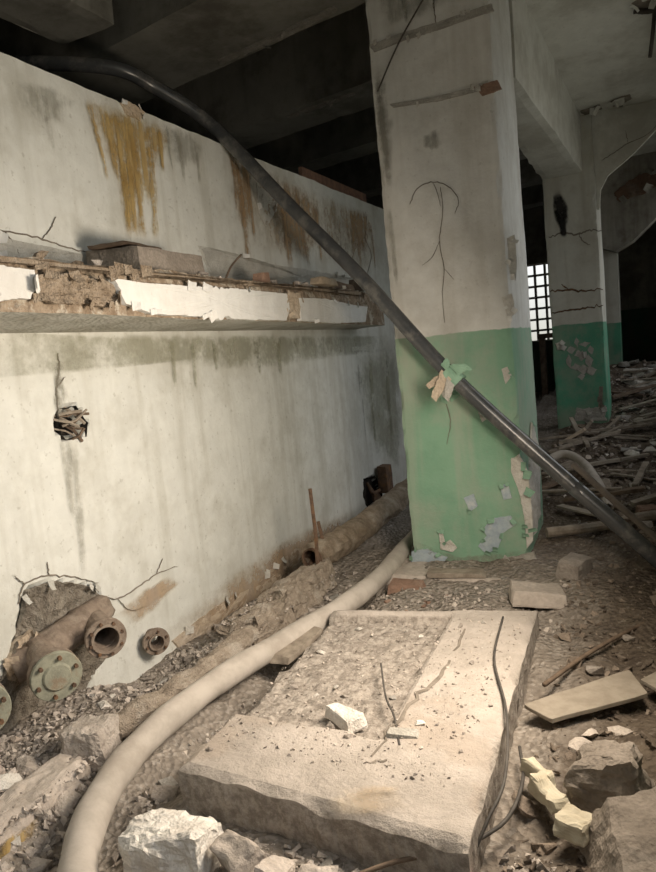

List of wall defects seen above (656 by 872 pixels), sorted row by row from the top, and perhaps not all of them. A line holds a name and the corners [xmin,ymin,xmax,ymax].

rust [88,107,164,230]
rust [231,161,255,254]
crack [549,229,602,245]
peeling [0,230,368,324]
crack [550,284,603,314]
peeling [555,338,597,380]
peeling [440,388,460,404]
peeling [530,421,539,445]
peeling [478,454,543,561]